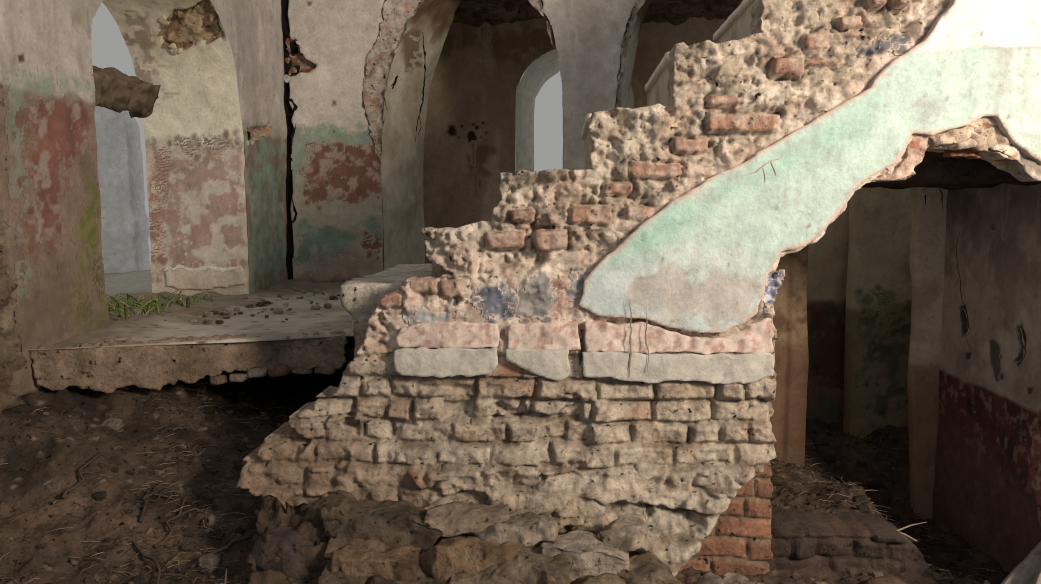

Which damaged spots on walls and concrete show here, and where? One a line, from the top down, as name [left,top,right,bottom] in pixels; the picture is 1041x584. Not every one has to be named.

peeling [0,64,95,301]
peeling [146,0,423,290]
crack [281,0,300,280]
flaking render [393,0,1041,384]
peeling [807,283,912,431]
peeling [1024,408,1041,530]